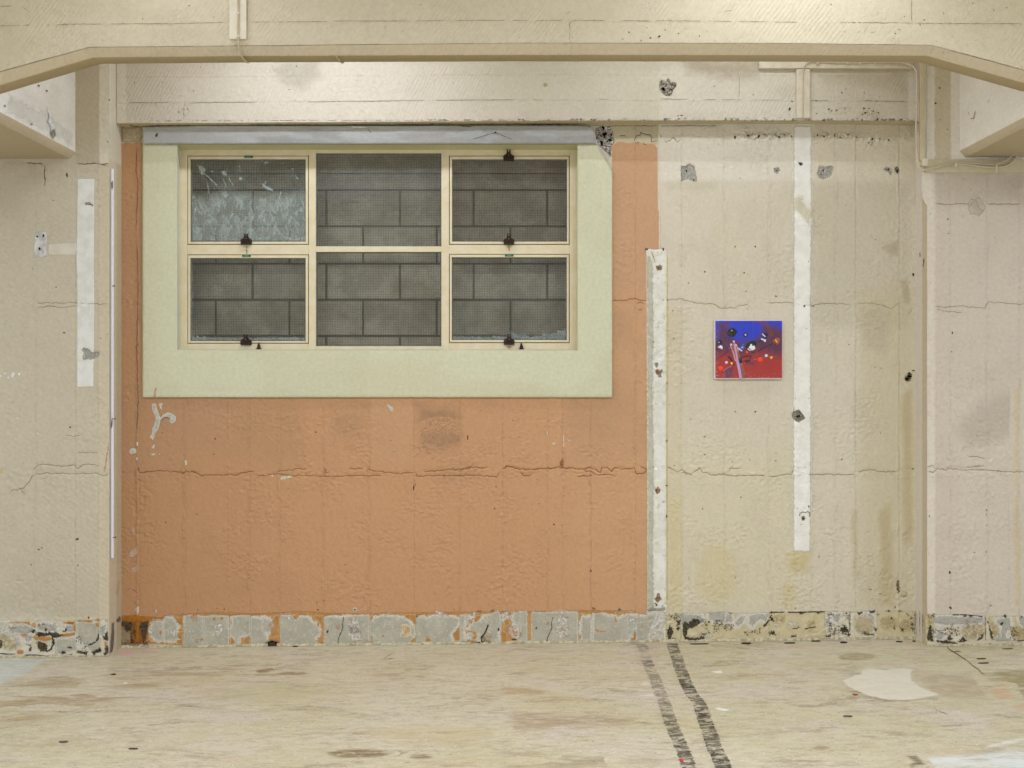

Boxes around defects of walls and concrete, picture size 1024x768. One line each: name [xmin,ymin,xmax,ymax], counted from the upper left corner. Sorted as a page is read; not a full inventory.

spalling [659,79,676,96]
spalling [591,119,614,157]
spalling [681,164,697,182]
peeling [734,126,873,552]
peeling [150,403,176,455]
crack [11,435,107,494]
crack [137,464,895,487]
crack [927,456,1023,473]
peeling [0,617,109,656]
peeling [146,600,666,646]
peeling [720,607,826,639]
peeling [934,605,1024,644]